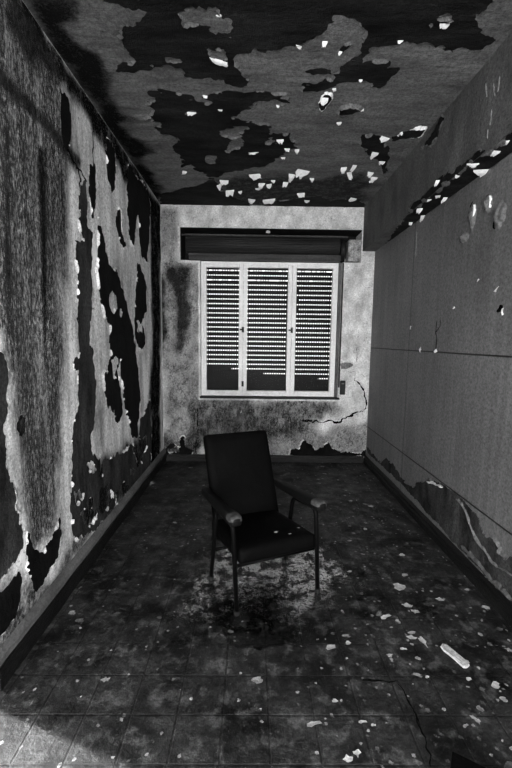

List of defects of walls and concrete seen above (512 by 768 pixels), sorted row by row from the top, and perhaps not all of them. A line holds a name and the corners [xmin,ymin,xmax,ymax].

peeling [60,89,71,151]
leakage [0,0,369,574]
peeling [70,0,512,542]
crack [302,348,367,424]
peeling [0,349,63,636]
spalling [289,440,512,603]
leakage [0,582,50,647]
crack [360,679,432,767]